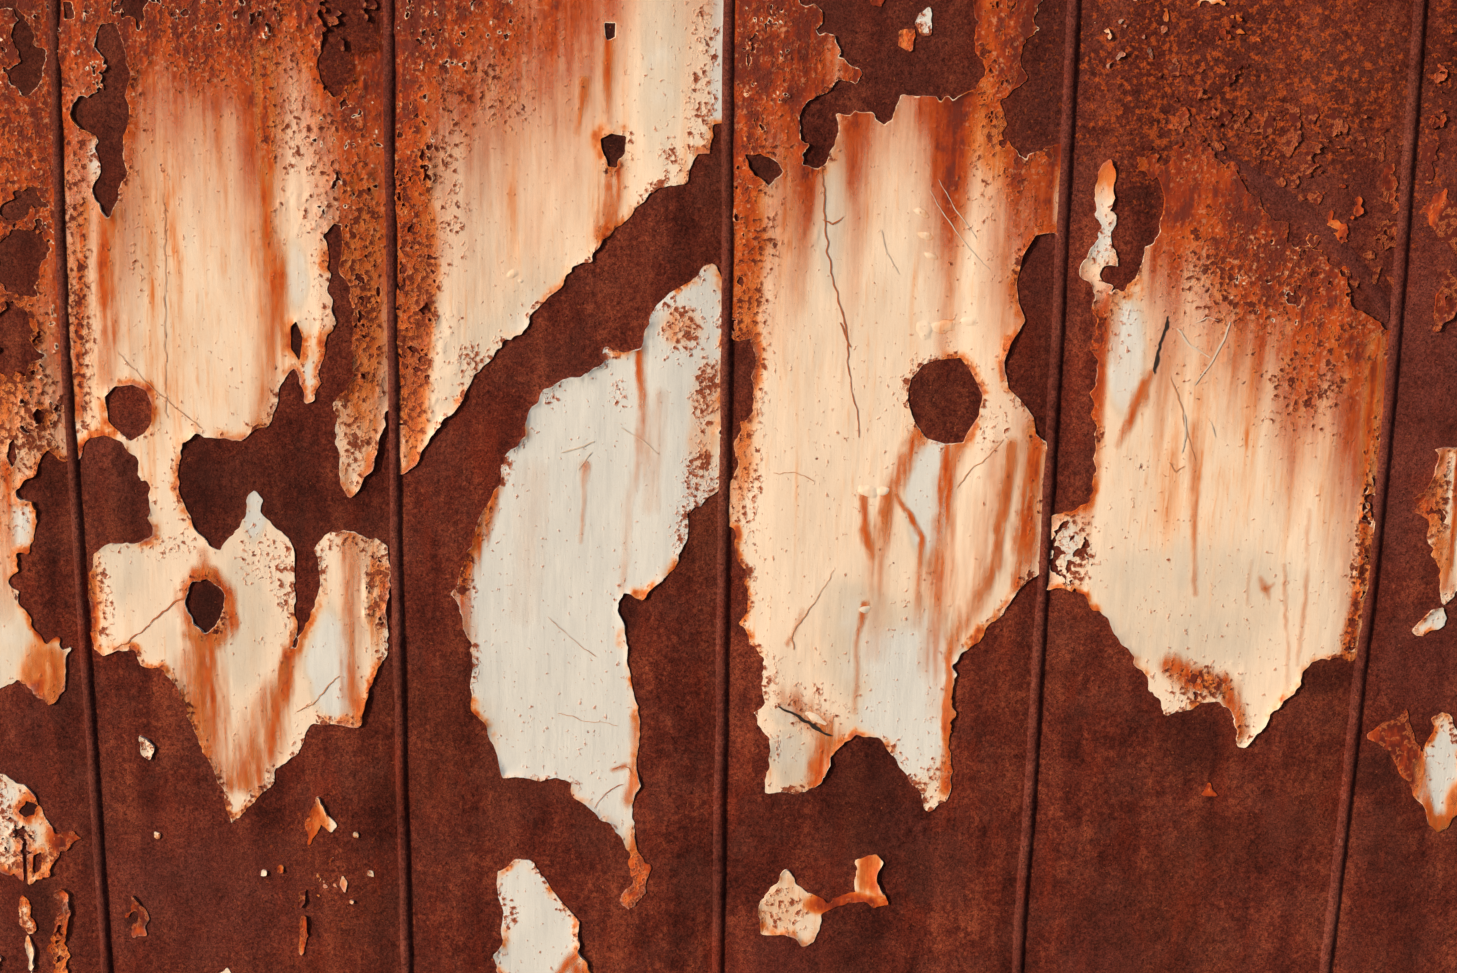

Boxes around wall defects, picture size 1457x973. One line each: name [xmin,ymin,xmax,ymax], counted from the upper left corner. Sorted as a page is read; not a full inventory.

corrosion [0,0,622,424]
spalling [397,94,434,209]
spalling [406,0,467,68]
corrosion [731,0,862,338]
corrosion [904,0,1061,311]
corrosion [182,559,305,792]
peeling [0,123,722,973]
corrosion [859,425,967,613]
corrosion [933,417,1043,794]
peeling [723,0,1457,973]
corrosion [1162,656,1245,741]
corrosion [1138,134,1391,661]